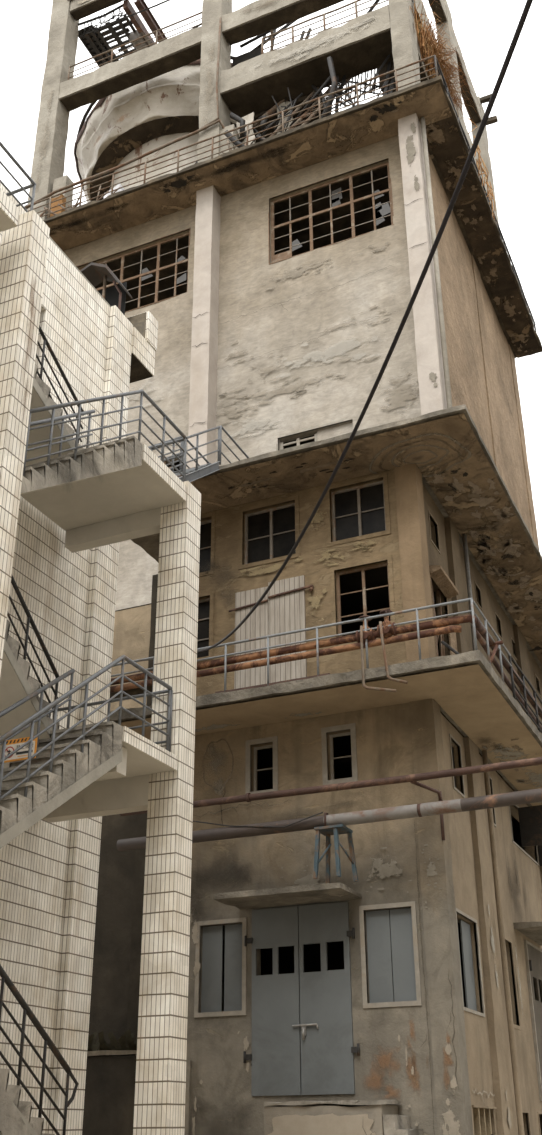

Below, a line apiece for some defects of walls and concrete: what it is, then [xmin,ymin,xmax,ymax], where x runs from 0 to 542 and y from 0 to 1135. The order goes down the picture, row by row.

spalling [370,101,402,122]
flaking render [405,121,461,191]
peeling [493,296,530,352]